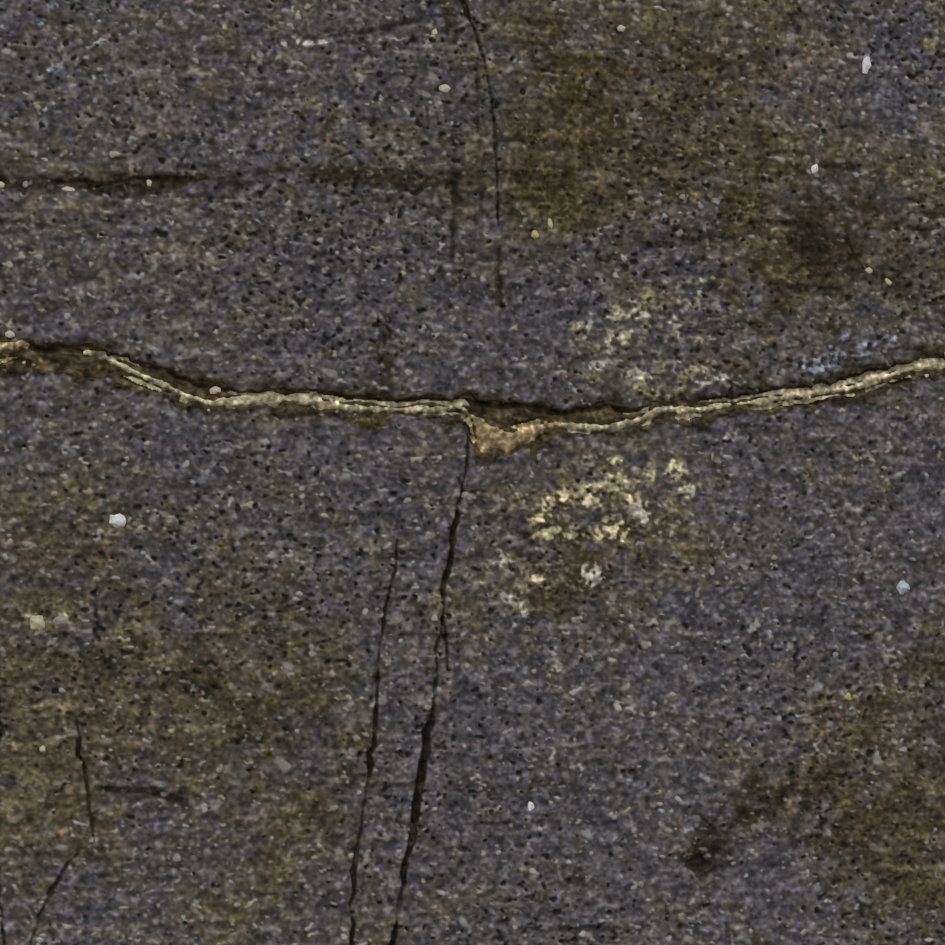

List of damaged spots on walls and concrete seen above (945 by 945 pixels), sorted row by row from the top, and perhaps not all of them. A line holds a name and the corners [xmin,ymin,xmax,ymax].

crack [459,0,489,84]
crack [492,116,500,225]
leakage [488,457,696,631]
crack [0,331,945,945]